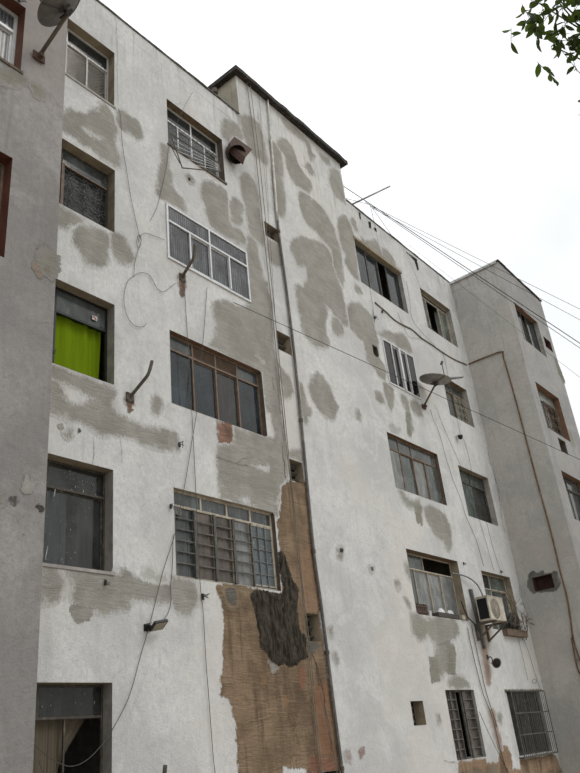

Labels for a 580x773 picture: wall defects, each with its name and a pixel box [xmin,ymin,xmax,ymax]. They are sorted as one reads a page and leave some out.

peeling [216,419,234,444]
peeling [216,479,366,773]
leakage [409,610,471,690]
peeling [458,744,562,773]